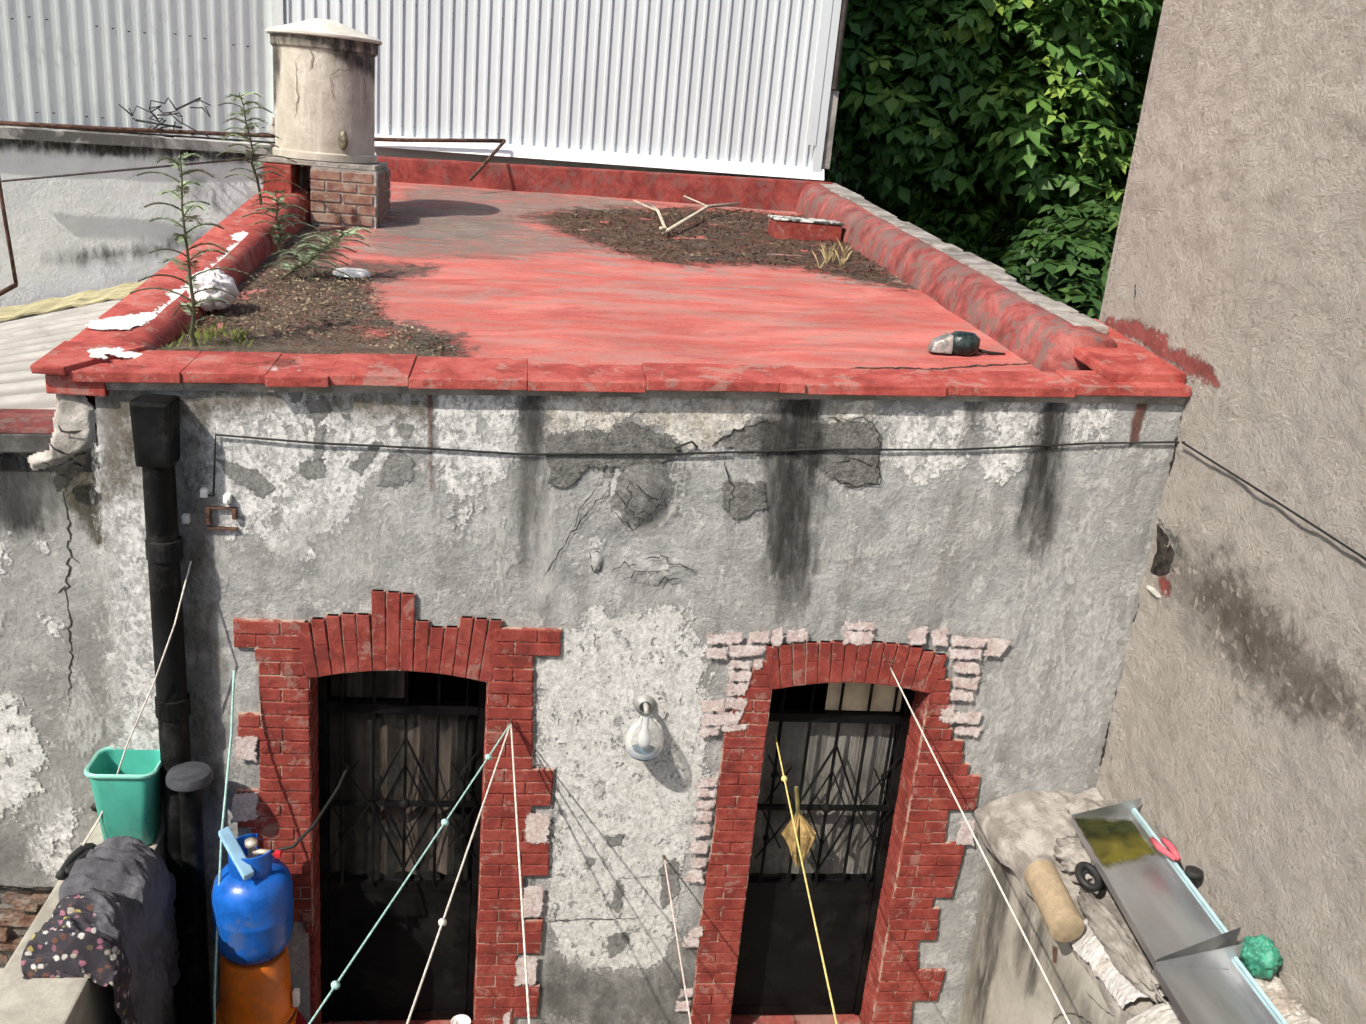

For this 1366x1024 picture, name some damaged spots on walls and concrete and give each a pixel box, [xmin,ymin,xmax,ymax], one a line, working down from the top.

damp [0,452,52,582]
crack [58,469,90,712]
damp [66,391,134,551]
crack [544,484,608,576]
peeling [174,391,1145,585]
damp [760,399,822,606]
peeling [843,620,875,646]
peeling [907,626,1012,738]
damp [1018,402,1065,545]
peeling [514,955,538,986]
peeling [674,988,694,1012]
damp [978,867,1008,1020]